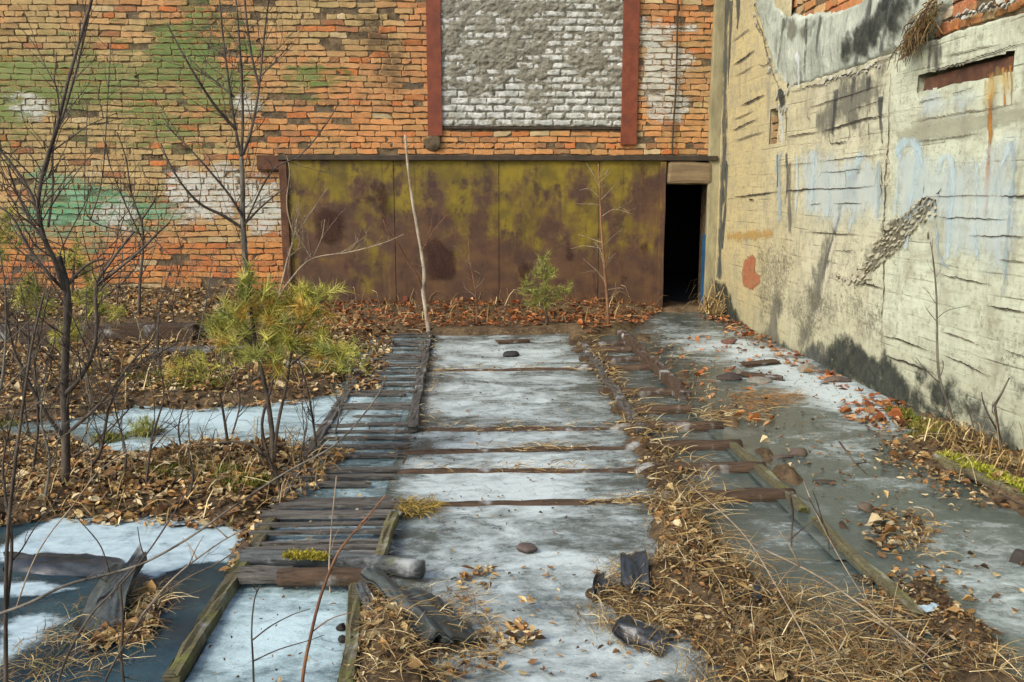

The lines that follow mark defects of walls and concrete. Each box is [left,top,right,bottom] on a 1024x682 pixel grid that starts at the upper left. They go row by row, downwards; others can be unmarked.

corrosion [314,208,341,243]
corrosion [423,239,453,279]
spalling [754,189,941,344]
leakage [816,0,917,143]
crack [733,0,1024,376]
leakage [764,204,1018,452]
corrosion [985,65,1012,215]